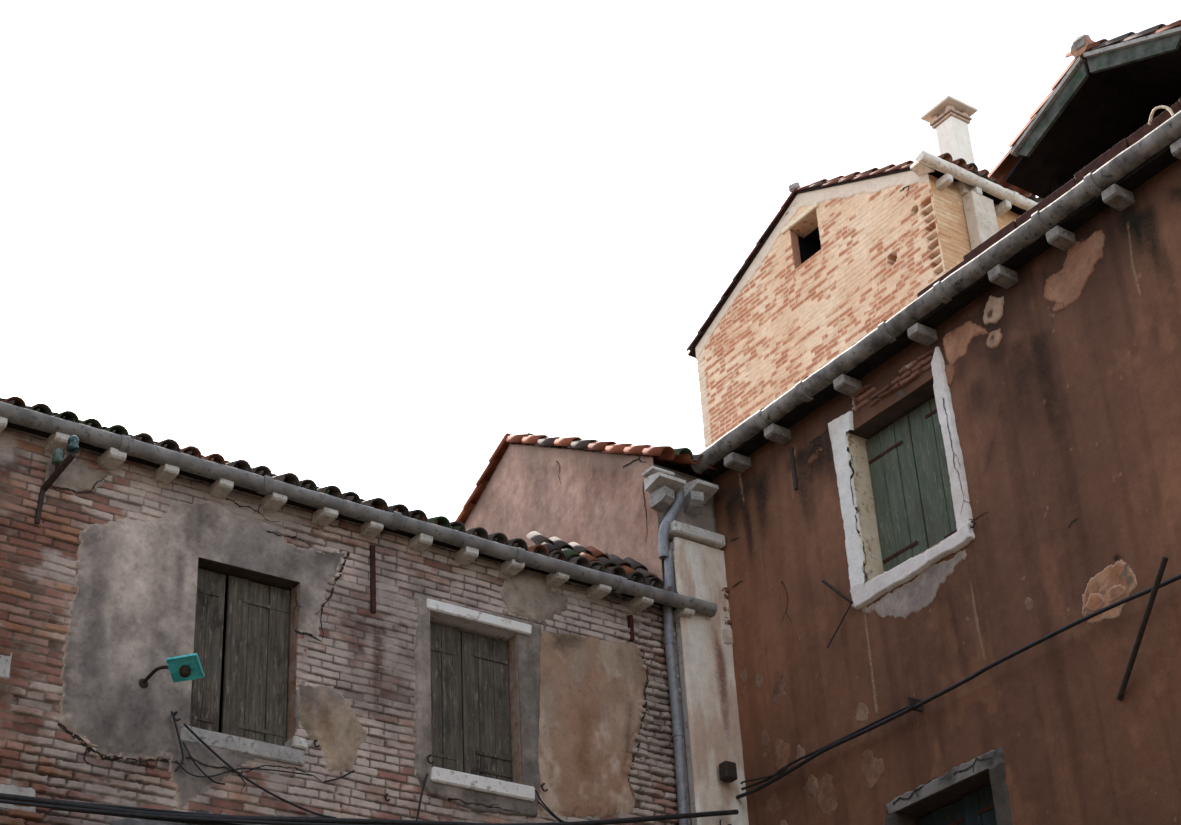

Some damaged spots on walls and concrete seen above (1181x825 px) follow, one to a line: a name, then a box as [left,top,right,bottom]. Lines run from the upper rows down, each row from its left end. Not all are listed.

spalling [1044,230,1105,313]
spalling [852,296,1004,411]
crack [942,397,988,520]
crack [291,552,350,642]
spalling [1082,555,1137,624]